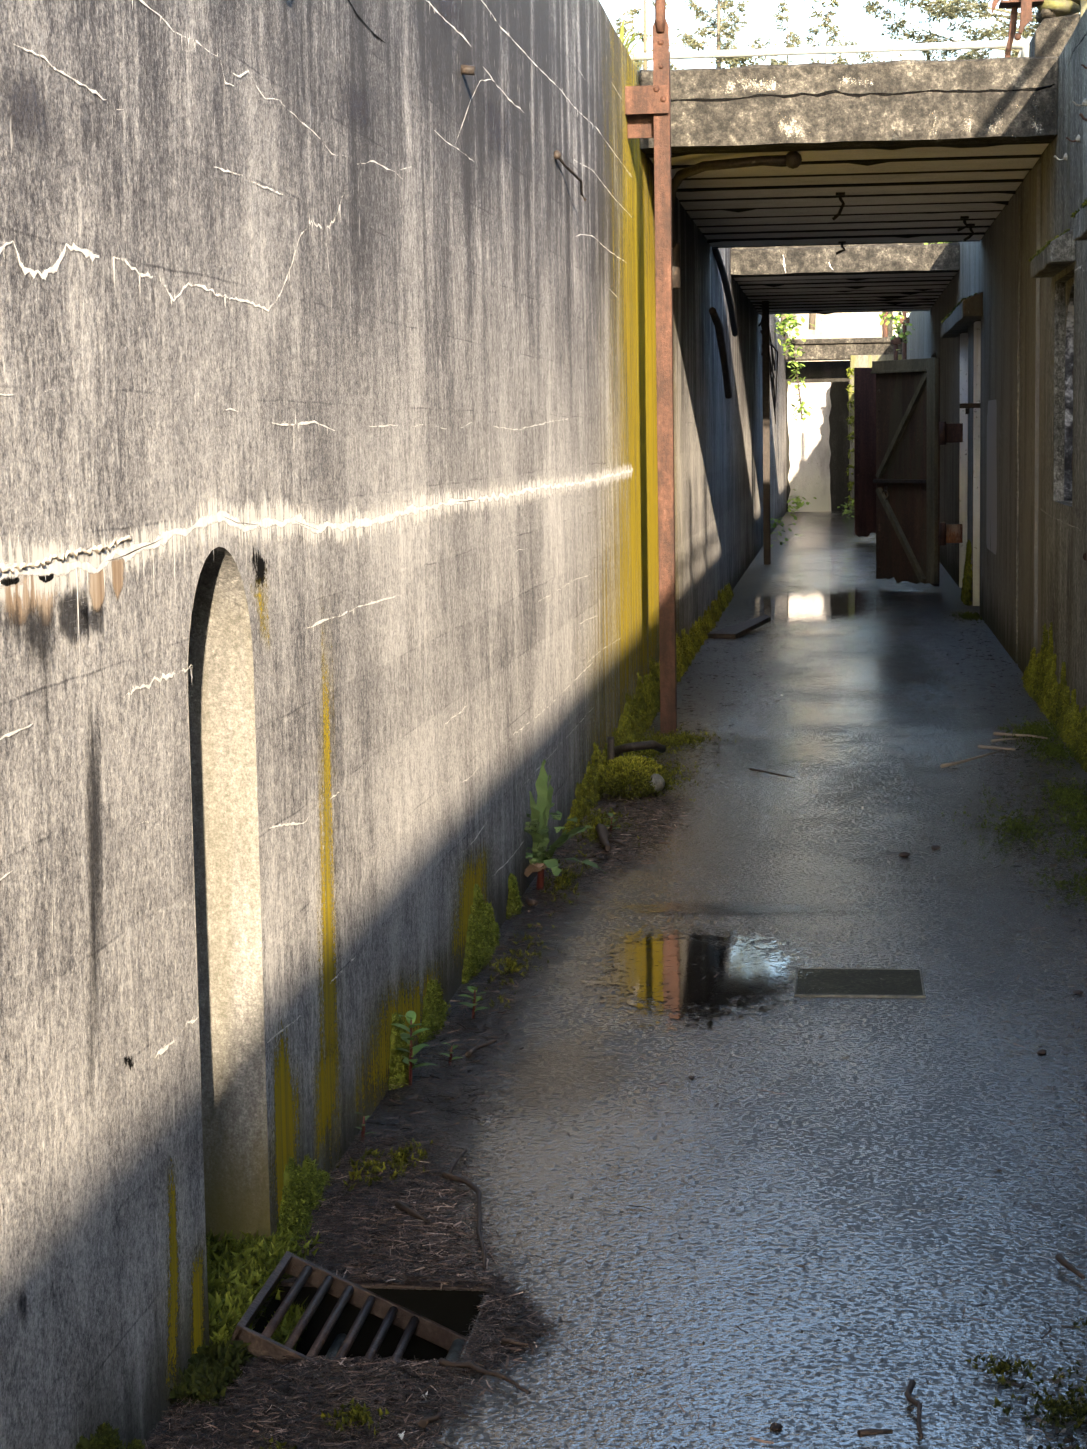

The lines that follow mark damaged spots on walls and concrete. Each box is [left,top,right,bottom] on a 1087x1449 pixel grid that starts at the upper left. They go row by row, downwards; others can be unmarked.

crack [0,0,410,313]
crack [0,463,633,678]
leakage [313,1035,339,1163]
leakage [190,1245,205,1371]